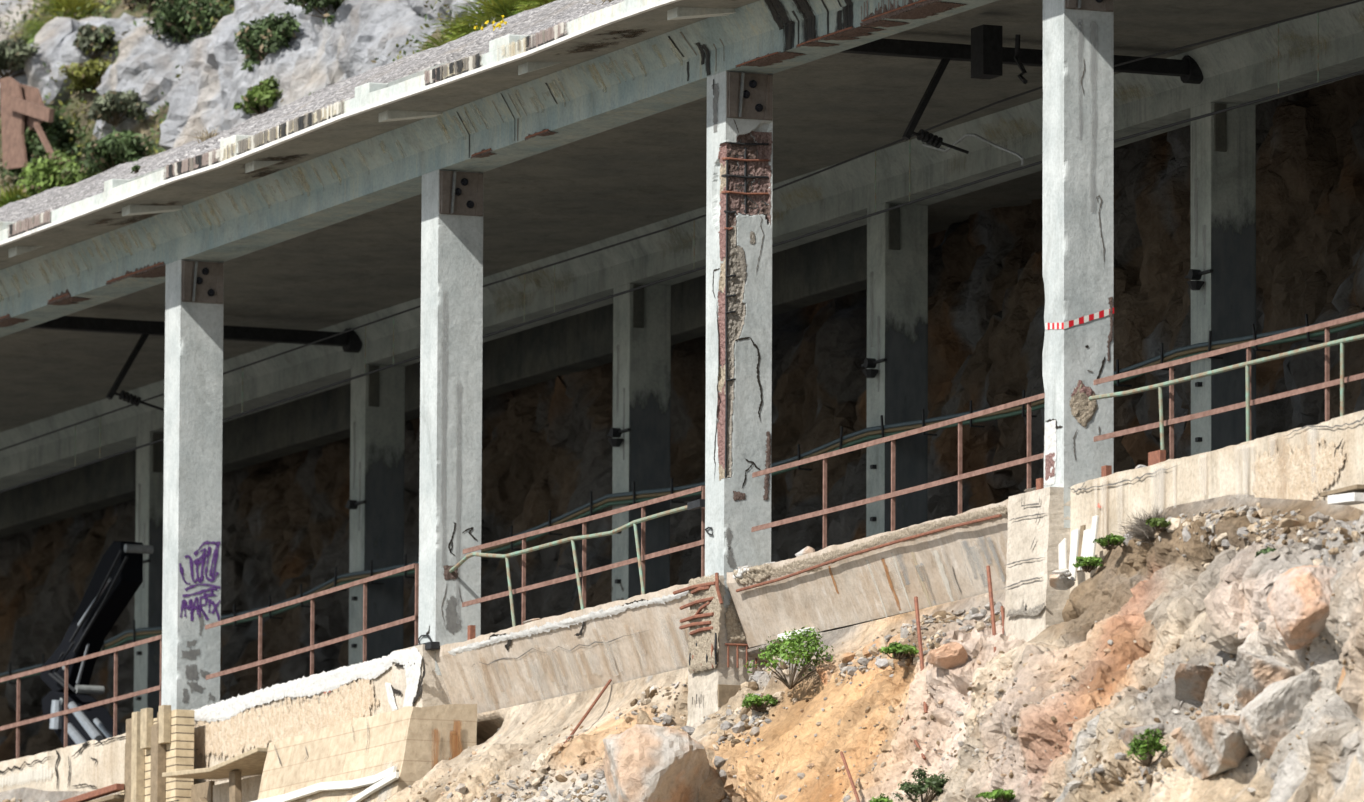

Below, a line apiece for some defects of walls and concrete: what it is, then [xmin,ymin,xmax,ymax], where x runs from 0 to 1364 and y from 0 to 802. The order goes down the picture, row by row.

damp [617,346,671,599]
crack [712,268,763,488]
spalling [717,131,773,501]
crack [756,215,764,273]
peeling [1044,420,1057,486]
spalling [1069,380,1098,427]
damp [1195,193,1256,451]